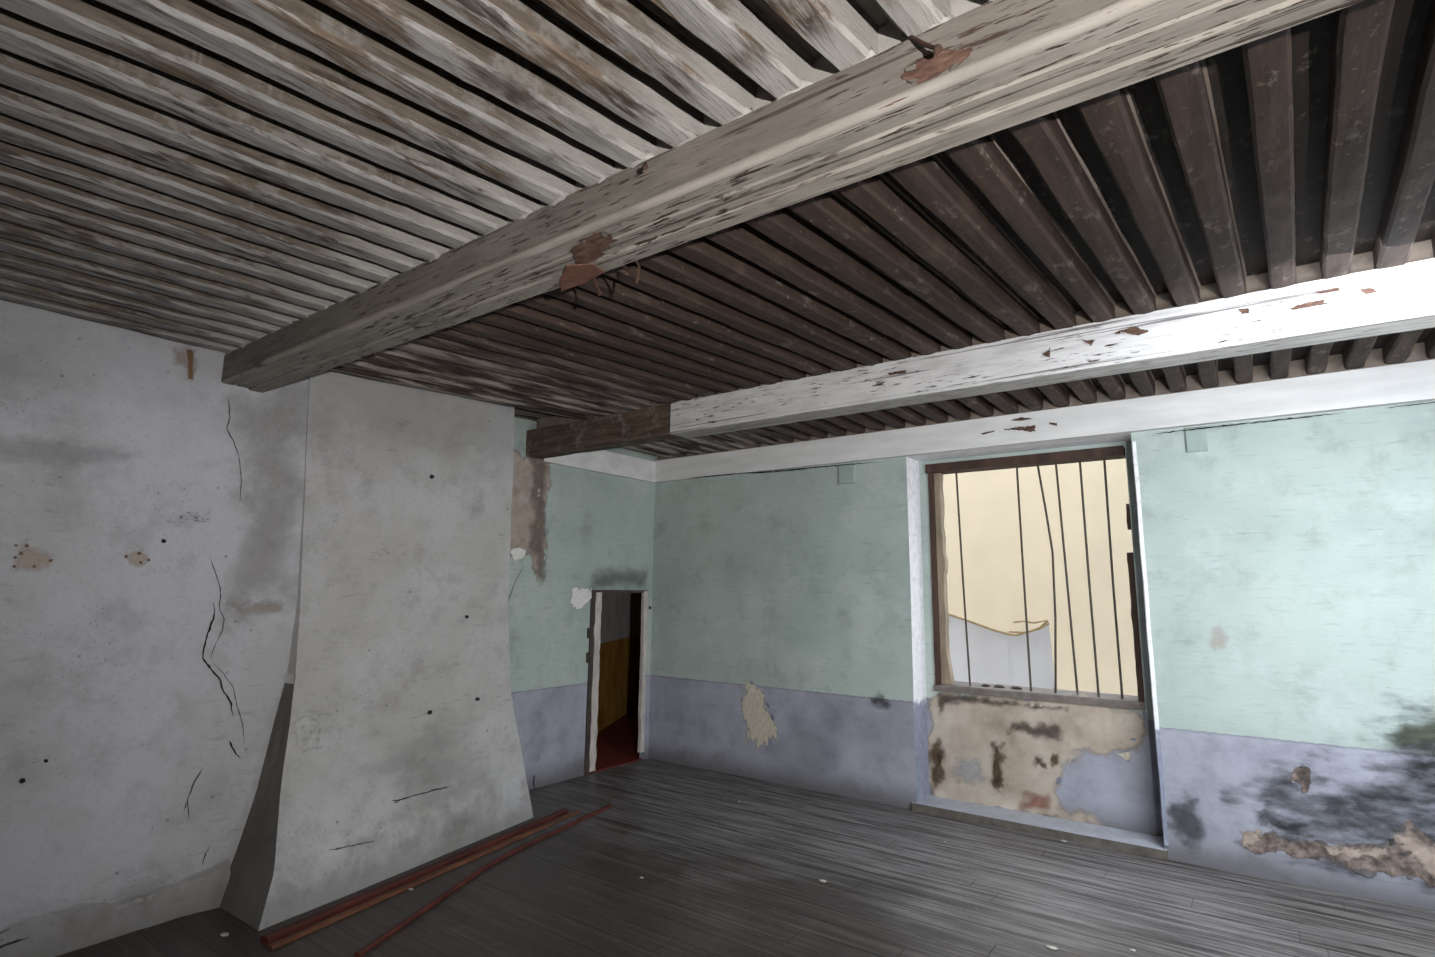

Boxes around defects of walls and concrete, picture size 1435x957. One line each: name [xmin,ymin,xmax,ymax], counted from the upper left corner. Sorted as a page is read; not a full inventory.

crack [227,399,242,498]
flaking render [510,450,551,576]
crack [202,558,244,758]
crack [184,768,203,816]
peeling [741,682,777,751]
peeling [928,692,1147,825]
damp [1168,800,1203,840]
flaking render [1241,820,1435,888]
damp [1259,723,1435,874]